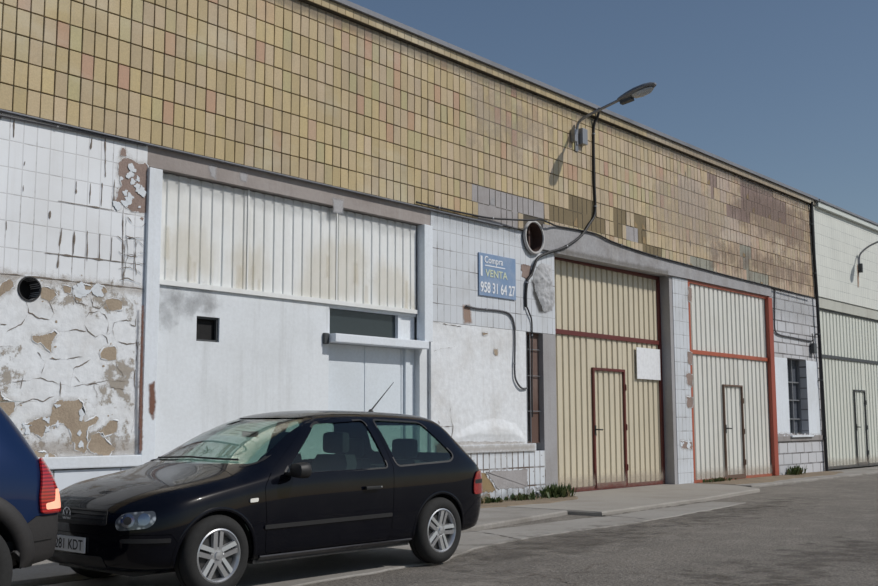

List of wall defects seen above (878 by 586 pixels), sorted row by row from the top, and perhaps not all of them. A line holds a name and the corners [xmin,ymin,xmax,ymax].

spalling [113,147,149,220]
peeling [472,184,661,257]
peeling [726,177,786,225]
spalling [0,279,15,296]
crack [0,138,146,417]
spalling [41,275,123,312]
spalling [31,320,58,358]
spalling [99,343,117,367]
spalling [0,389,22,416]
rust [139,306,156,453]
spalling [21,398,119,456]
spalling [481,468,543,499]